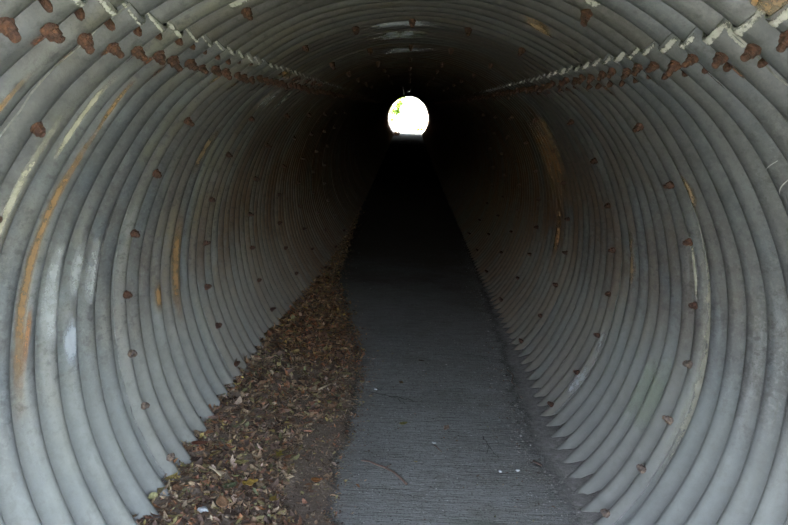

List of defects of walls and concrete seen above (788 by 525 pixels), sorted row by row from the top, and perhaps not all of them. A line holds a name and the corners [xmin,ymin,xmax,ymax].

rust [99,0,352,96]
rust [479,0,788,98]
rust [14,155,81,379]